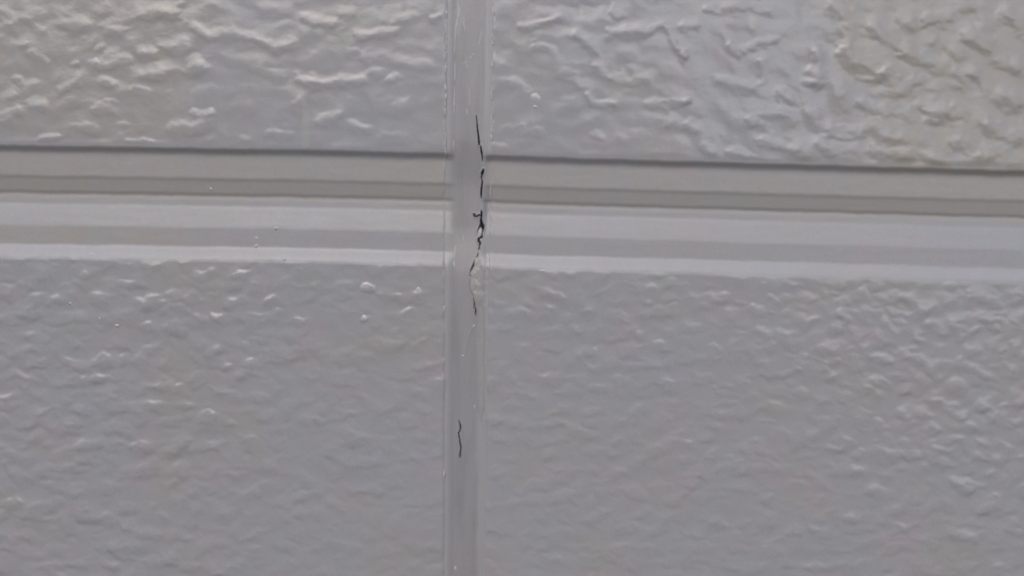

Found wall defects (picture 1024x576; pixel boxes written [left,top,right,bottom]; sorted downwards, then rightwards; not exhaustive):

crack [473,116,485,250]